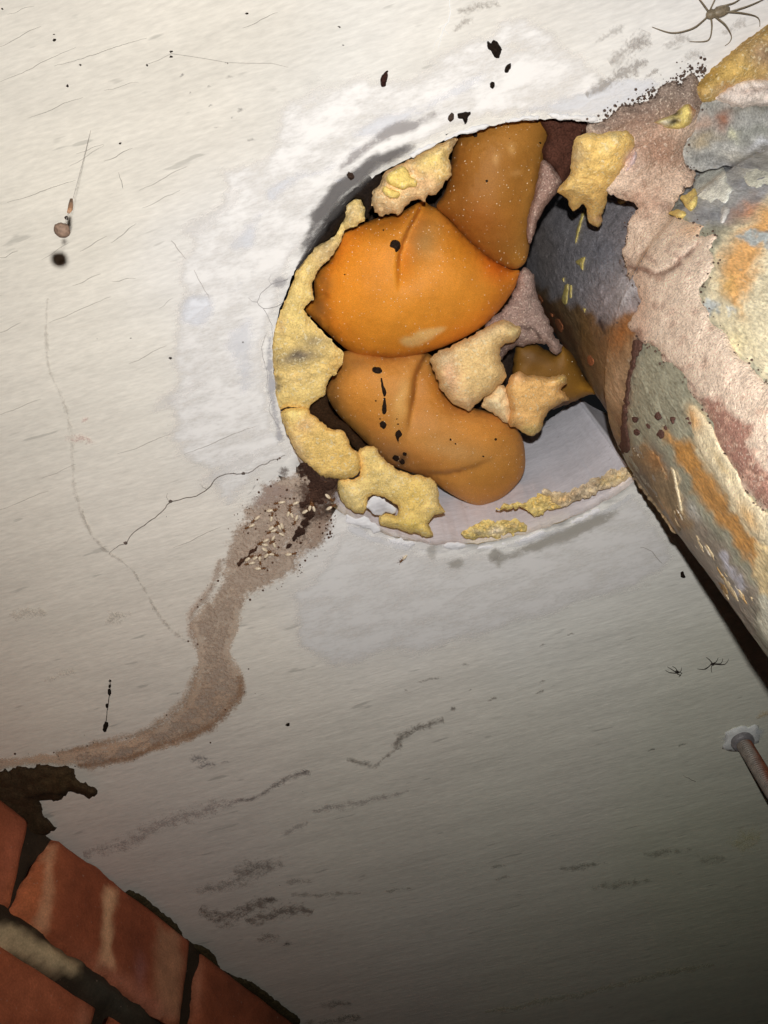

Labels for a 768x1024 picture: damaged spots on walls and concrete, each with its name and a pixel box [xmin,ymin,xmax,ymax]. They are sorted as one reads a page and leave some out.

crack [113,455,285,550]
rust [628,445,686,534]
rust [695,535,753,604]